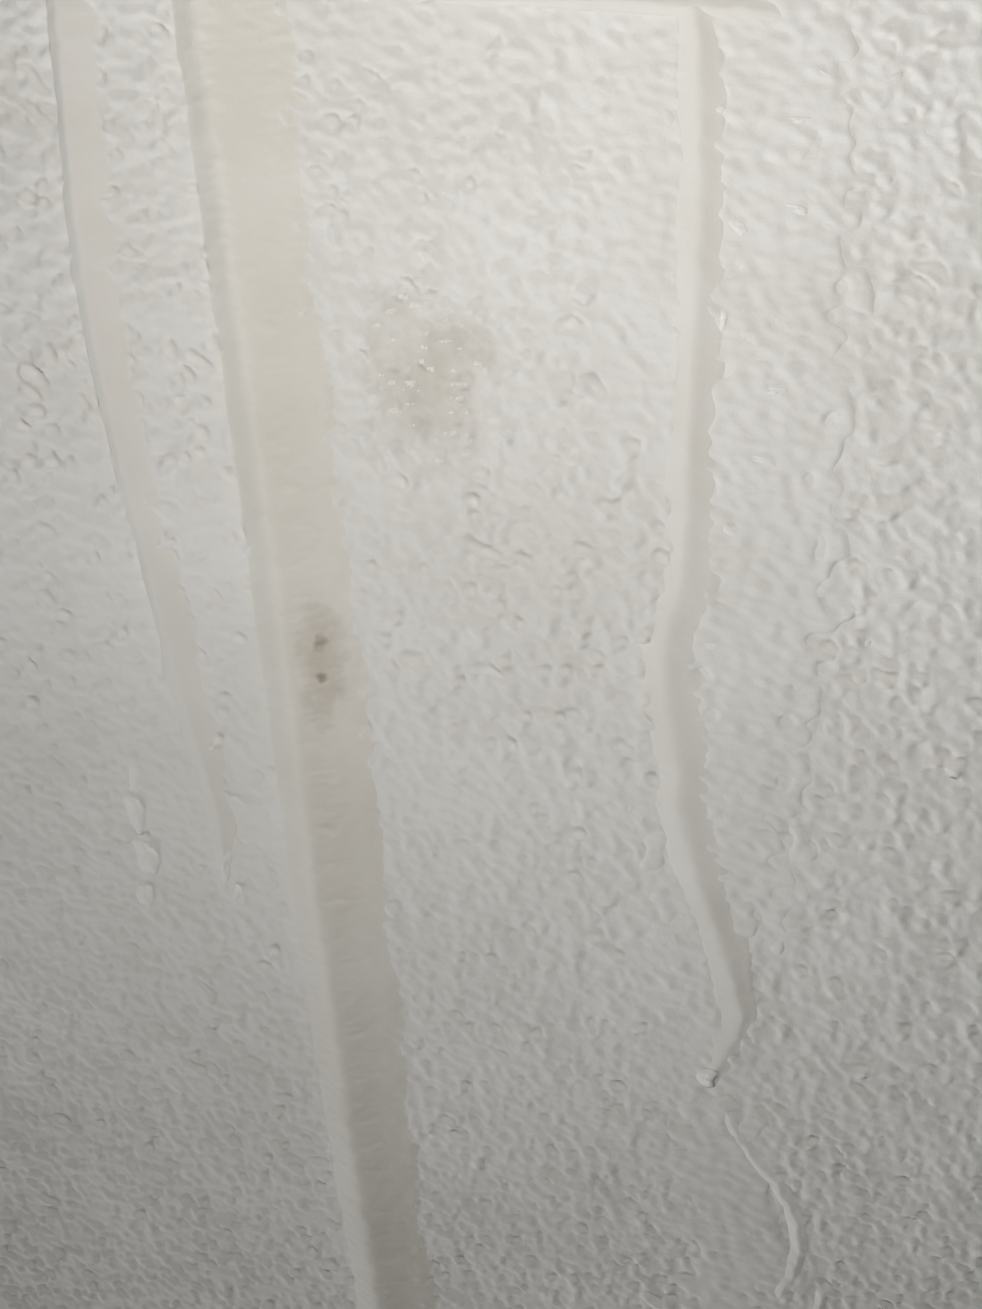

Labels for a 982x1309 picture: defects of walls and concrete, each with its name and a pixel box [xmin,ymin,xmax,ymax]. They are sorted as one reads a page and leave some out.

crack [404,0,827,1309]